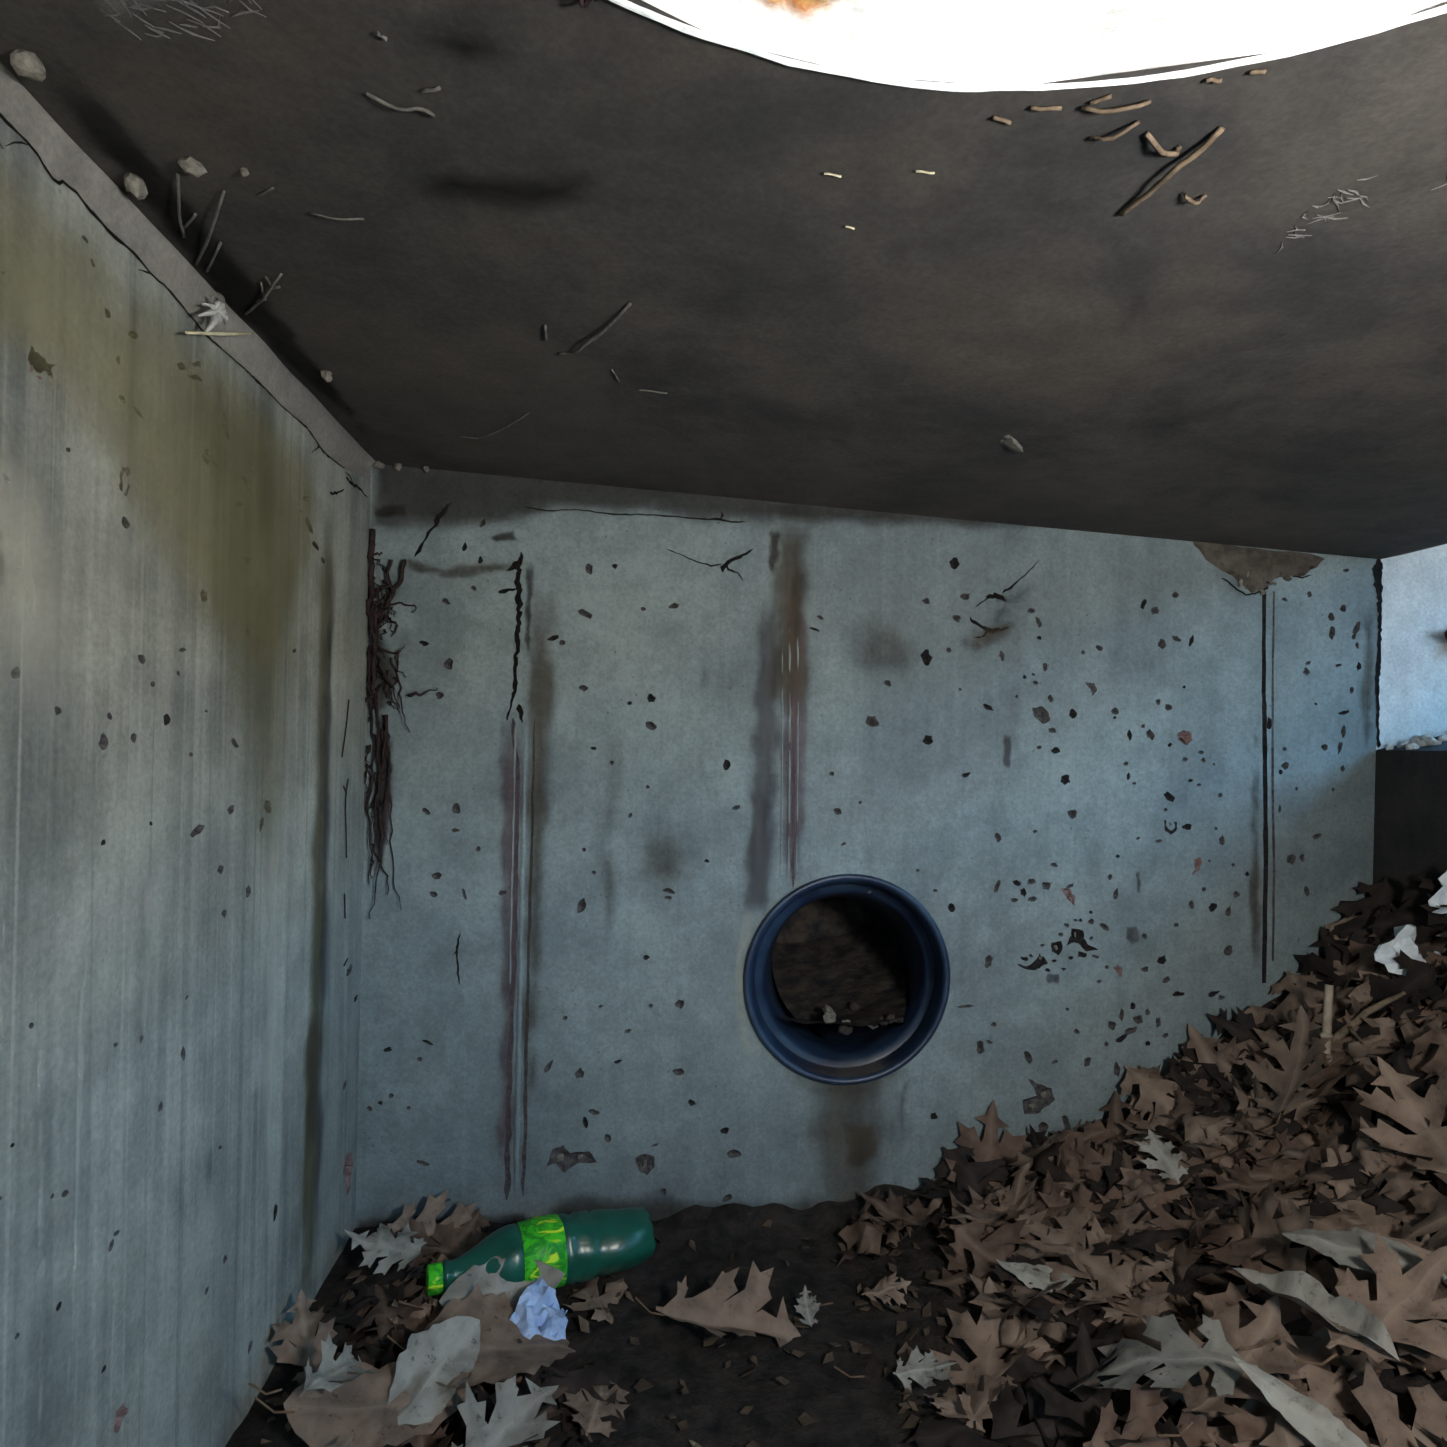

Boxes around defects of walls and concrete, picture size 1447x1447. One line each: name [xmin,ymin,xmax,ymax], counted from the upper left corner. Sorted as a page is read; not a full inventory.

rust [767,0,829,14]
crack [0,113,367,497]
crack [540,509,753,581]
peeling [1193,541,1324,601]
spalling [1328,605,1361,671]
damp [749,534,806,903]
spalling [1321,710,1349,772]
damp [498,572,551,1140]